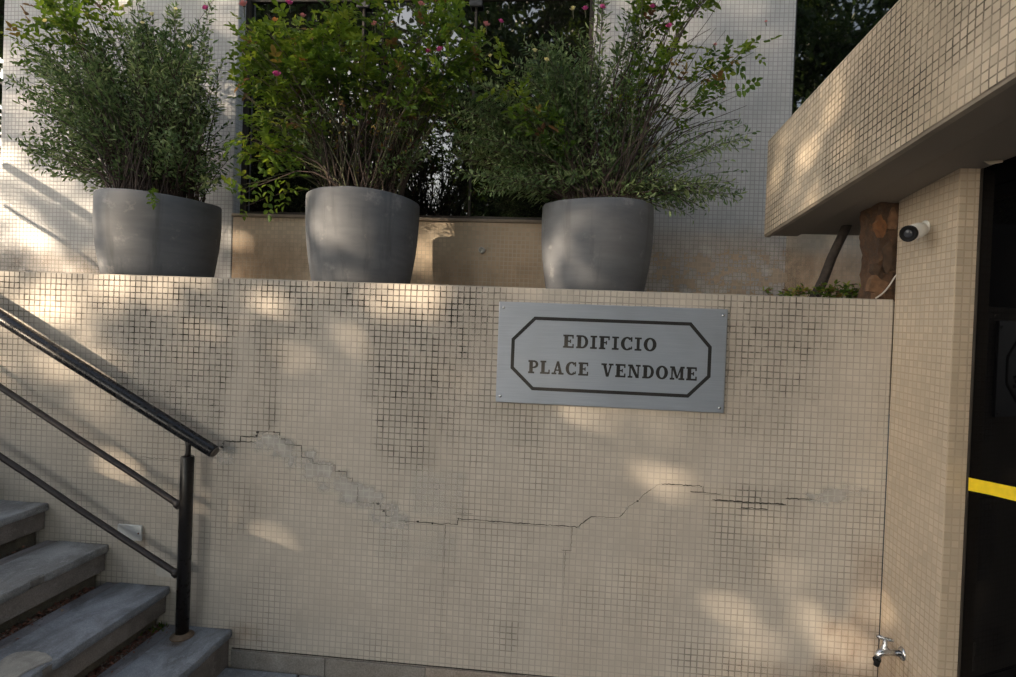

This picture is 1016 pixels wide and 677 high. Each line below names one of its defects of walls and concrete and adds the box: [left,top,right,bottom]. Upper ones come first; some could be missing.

water stain [0,272,501,421]
water stain [379,410,426,459]
crack [218,372,861,647]